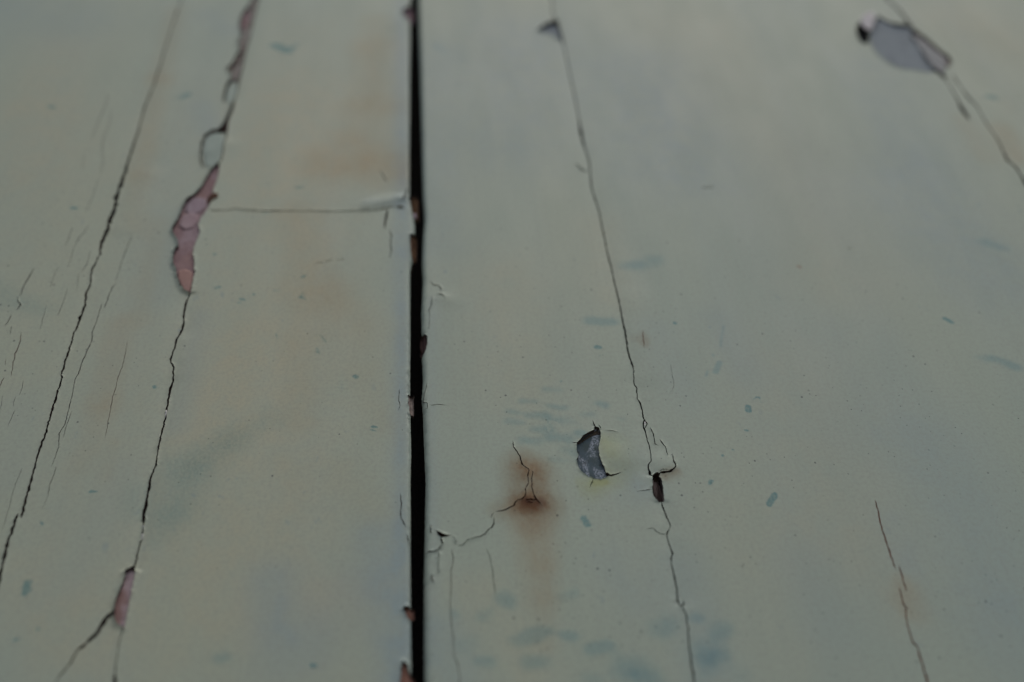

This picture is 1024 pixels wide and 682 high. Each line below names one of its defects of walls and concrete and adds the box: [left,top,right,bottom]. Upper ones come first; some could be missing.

peeling [216,0,258,133]
peeling [856,12,951,79]
crack [944,75,1024,183]
crack [0,0,181,582]
peeling [172,162,219,293]
crack [211,170,409,258]
crack [551,0,695,682]
crack [133,294,191,571]
peeling [573,422,621,486]
peeling [56,566,136,682]
crack [400,444,541,682]
crack [875,501,928,682]